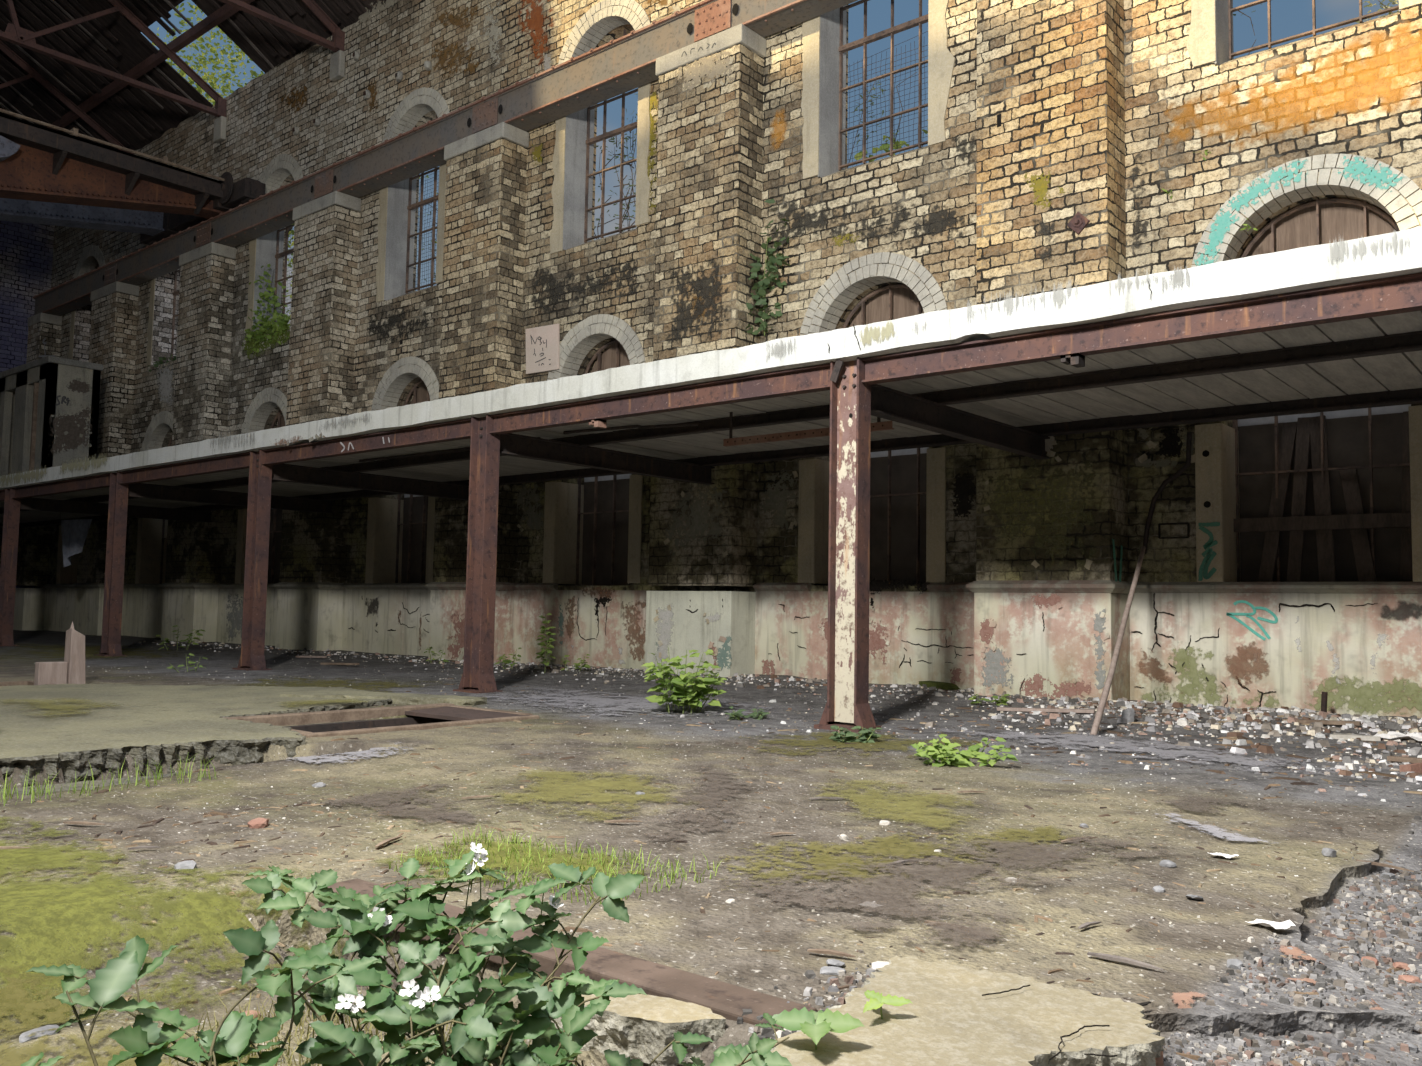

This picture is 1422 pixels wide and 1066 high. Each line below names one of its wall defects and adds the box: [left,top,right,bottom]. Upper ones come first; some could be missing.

corrosion [519,0,552,65]
damp [532,258,648,314]
damp [667,259,729,345]
crack [1131,593,1276,707]
damp [1309,601,1422,714]